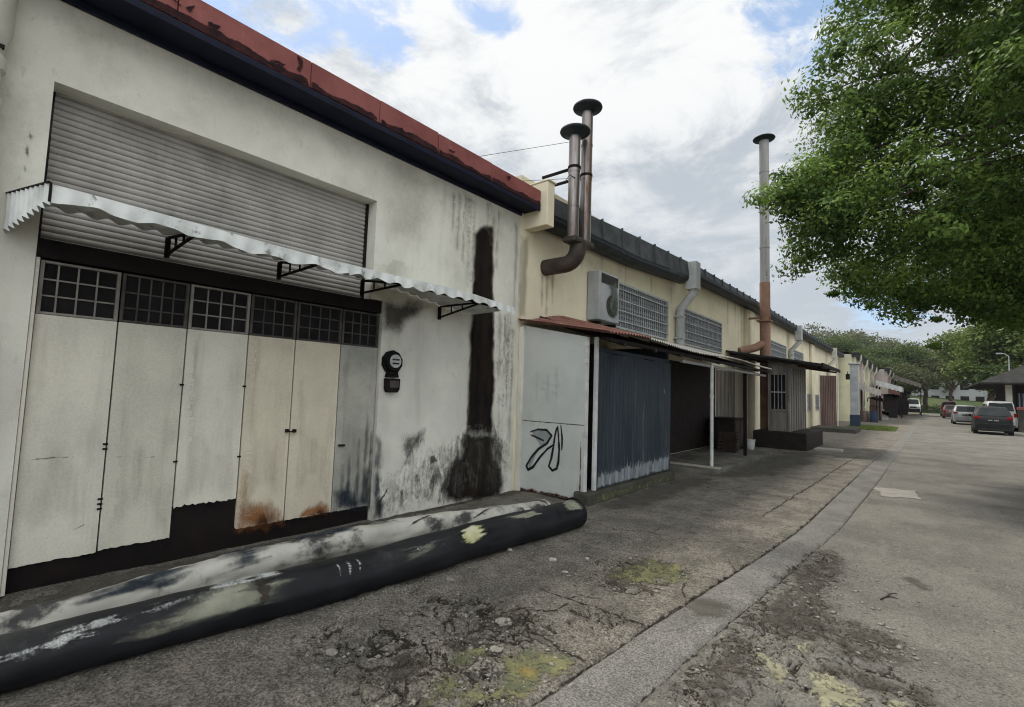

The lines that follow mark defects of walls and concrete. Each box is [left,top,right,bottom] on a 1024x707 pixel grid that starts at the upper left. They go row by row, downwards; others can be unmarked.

leakage [345,433,383,517]
leakage [404,434,421,458]
leakage [430,446,461,501]
rust [239,505,275,526]
rust [301,505,327,516]
crack [294,457,914,707]